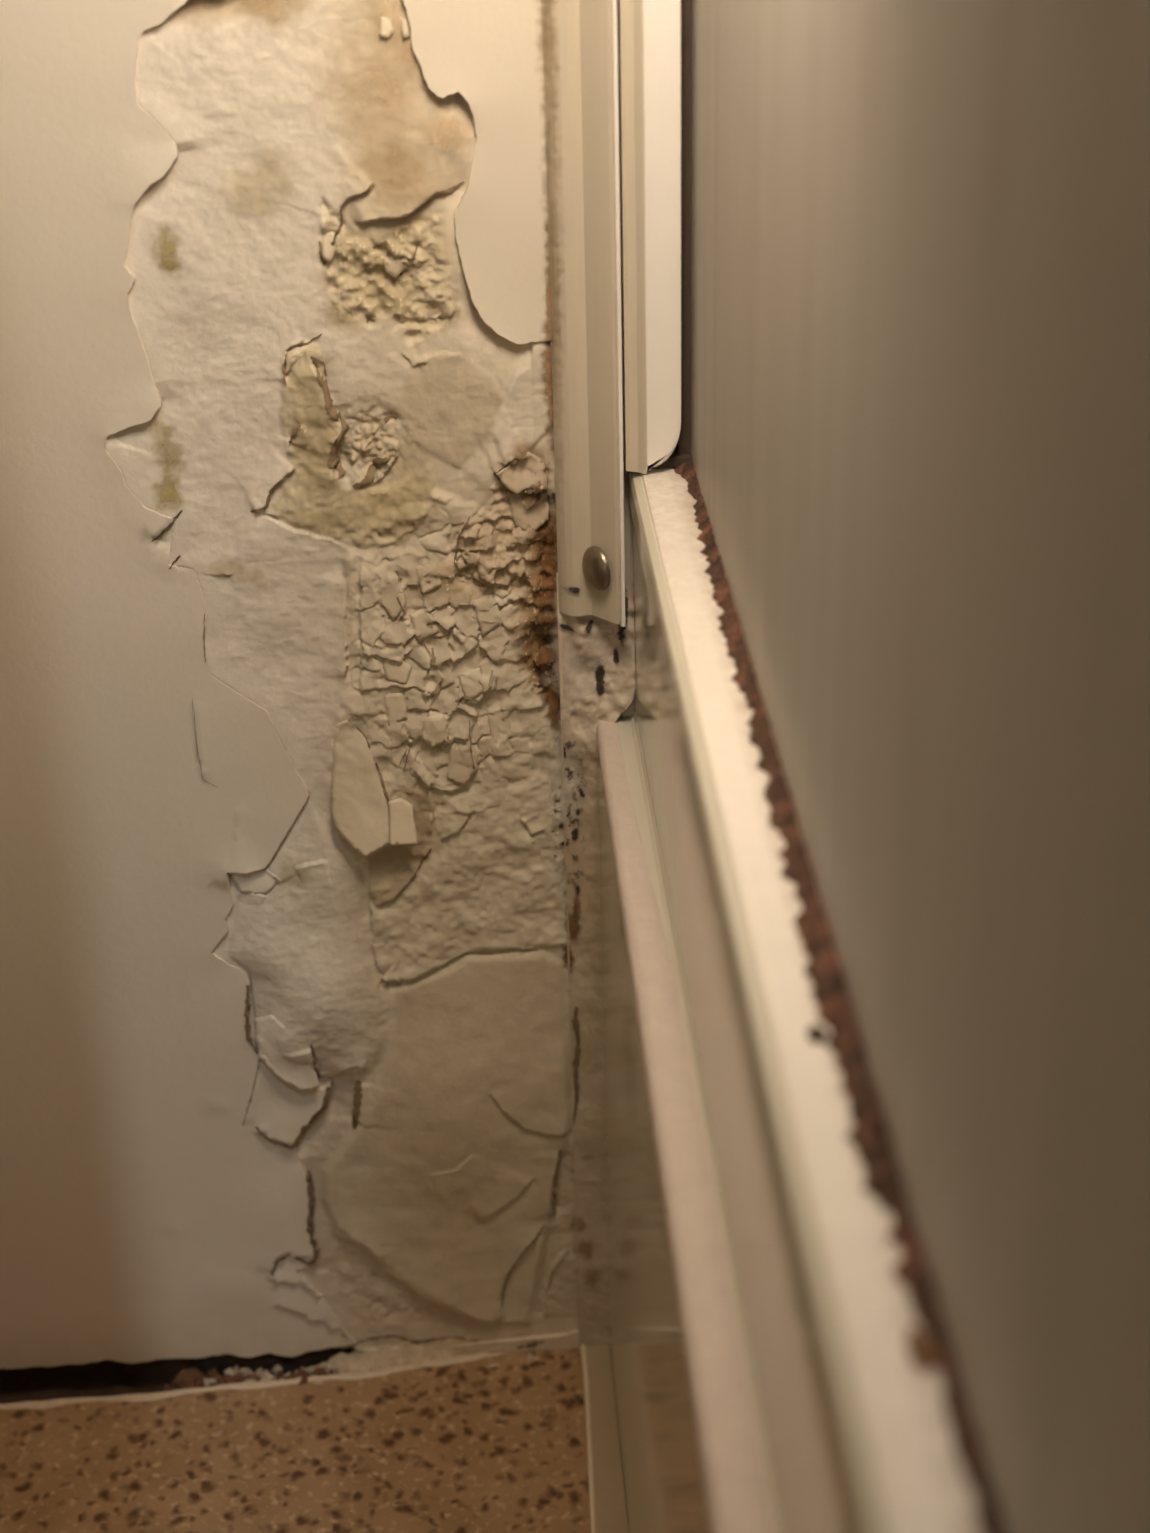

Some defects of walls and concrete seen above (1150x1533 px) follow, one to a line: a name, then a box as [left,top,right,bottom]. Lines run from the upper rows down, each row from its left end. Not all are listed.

peeling [105,0,562,925]
peeling [296,981,579,1351]